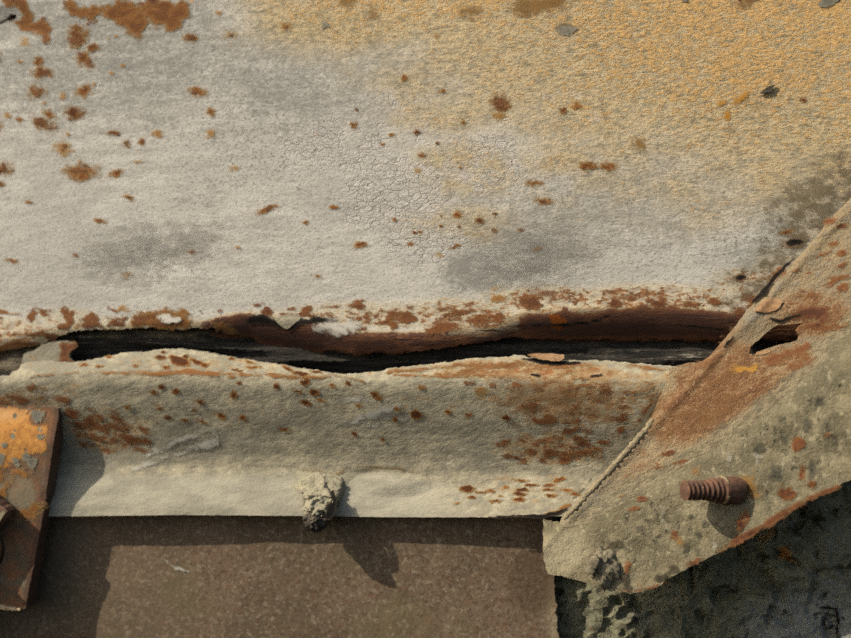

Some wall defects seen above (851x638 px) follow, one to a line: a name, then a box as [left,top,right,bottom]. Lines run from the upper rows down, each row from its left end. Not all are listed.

rust [1,0,52,45]
rust [63,0,198,68]
rust [22,56,121,182]
peeling [21,340,77,364]
rust [0,304,192,351]
peeling [275,314,301,329]
rust [212,299,417,355]
peeling [312,318,360,337]
rust [519,290,783,341]
rust [65,350,351,406]
rust [387,353,661,465]
rust [454,476,581,504]